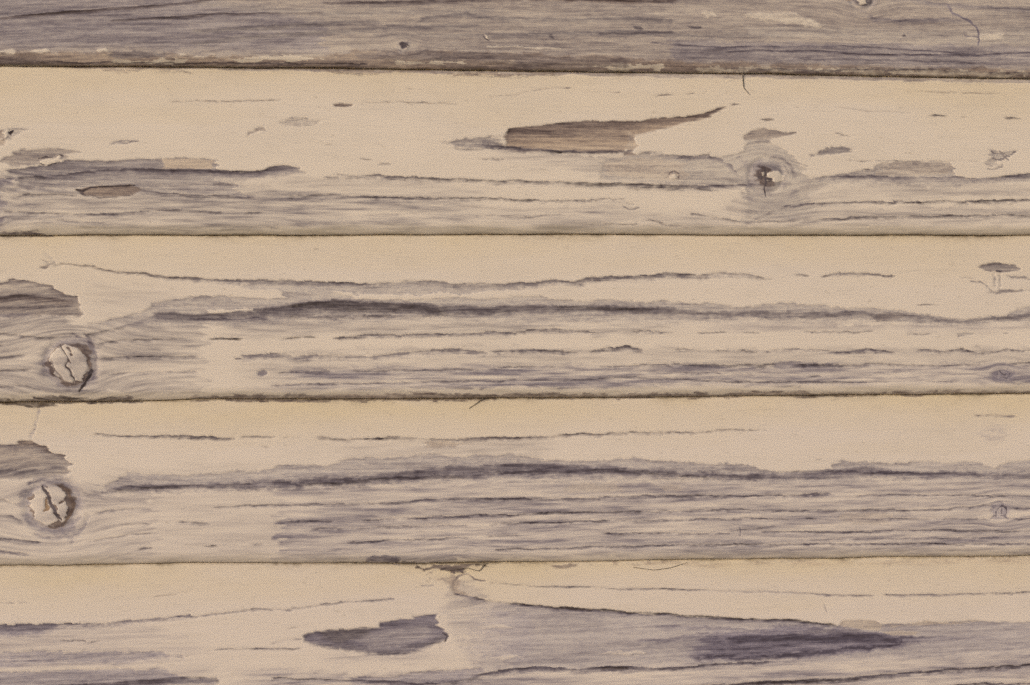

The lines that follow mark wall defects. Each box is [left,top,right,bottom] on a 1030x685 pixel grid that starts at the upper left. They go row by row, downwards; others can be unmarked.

peeling [0,0,1030,84]
peeling [0,126,308,232]
peeling [440,103,1030,221]
peeling [0,278,1030,330]
peeling [959,261,1030,296]
peeling [49,344,88,382]
peeling [234,344,1030,378]
peeling [0,439,75,526]
peeling [80,452,1030,500]
peeling [0,597,395,670]
peeling [204,591,1030,676]